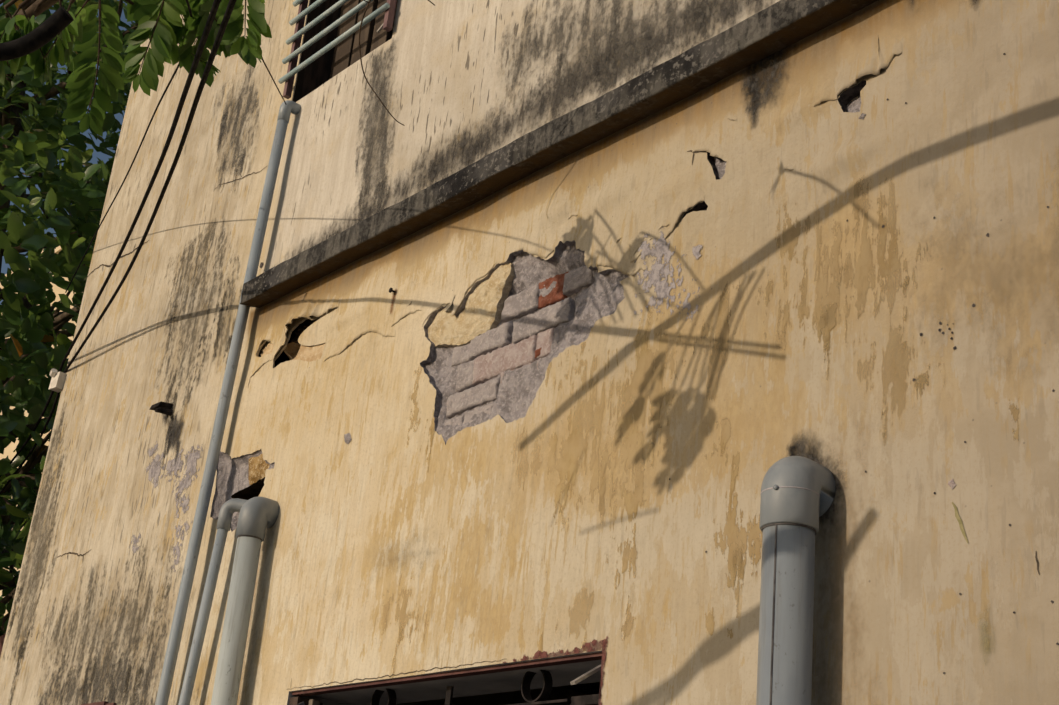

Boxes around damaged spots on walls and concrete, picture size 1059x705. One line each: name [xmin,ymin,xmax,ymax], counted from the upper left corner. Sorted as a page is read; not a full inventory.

damp [292,0,768,255]
flaking render [692,132,727,180]
damp [742,49,785,124]
flaking render [813,34,902,119]
damp [166,221,242,412]
flaking render [247,187,708,472]
damp [10,412,172,705]
flaking render [210,449,275,520]
peeling [527,312,686,638]
damp [789,438,827,468]